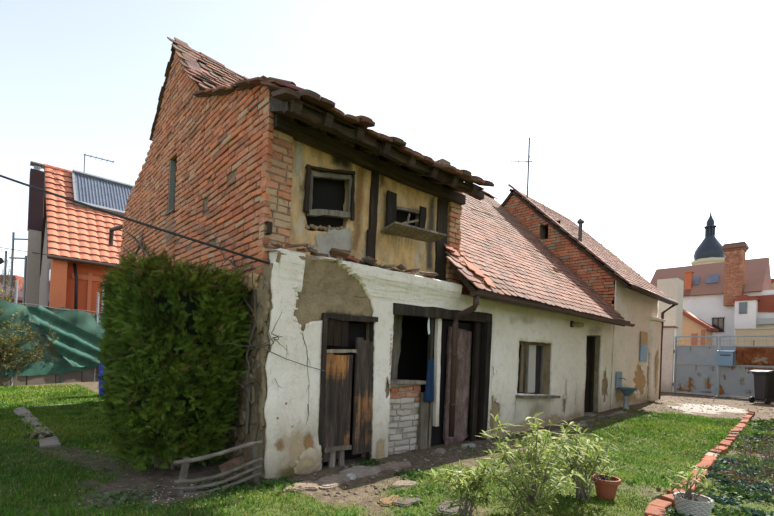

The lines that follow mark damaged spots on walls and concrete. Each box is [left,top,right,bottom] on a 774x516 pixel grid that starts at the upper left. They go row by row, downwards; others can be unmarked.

flaking render [292,283,373,335]
crack [286,334,311,424]
flaking render [633,364,648,395]
rust [677,347,774,395]